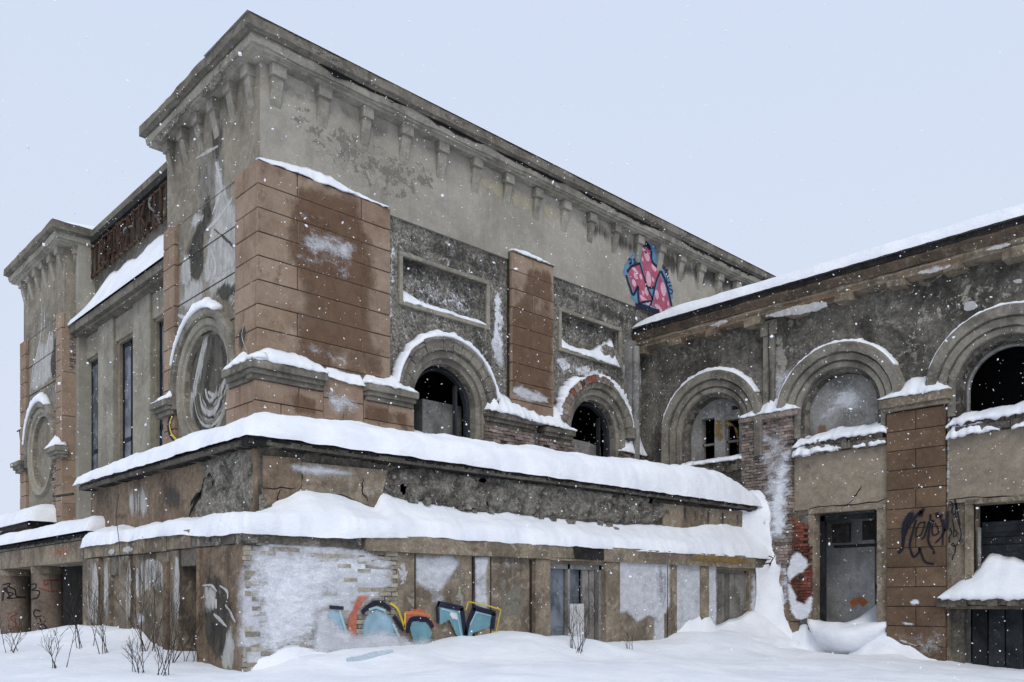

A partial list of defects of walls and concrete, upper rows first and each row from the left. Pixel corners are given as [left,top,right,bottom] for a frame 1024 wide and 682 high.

peeling [294,108,434,203]
damp [290,190,382,377]
spalling [192,449,272,517]
spalling [384,467,669,530]
flaking render [483,424,575,452]
flaking render [785,514,813,605]